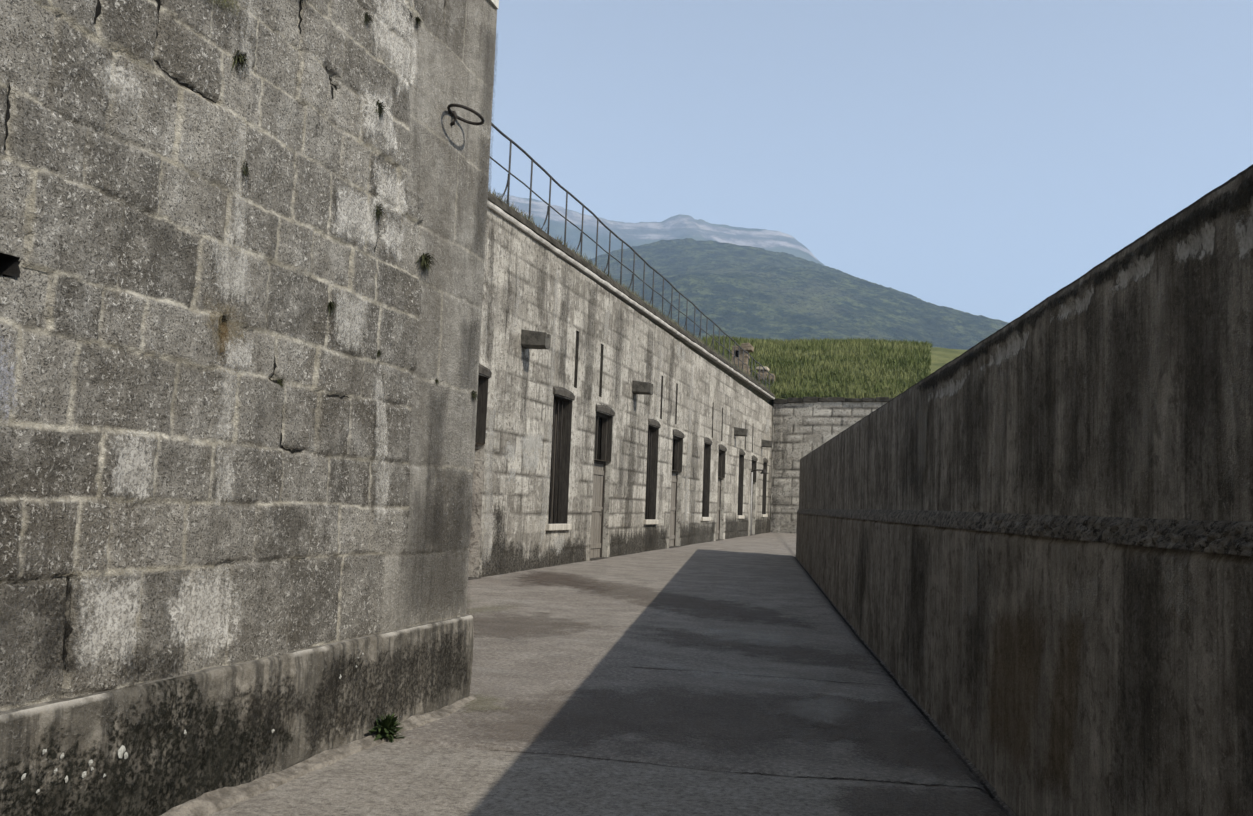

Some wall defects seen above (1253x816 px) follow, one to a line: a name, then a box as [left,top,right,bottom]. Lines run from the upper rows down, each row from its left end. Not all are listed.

crack [94,0,102,24]
crack [154,0,216,104]
crack [296,0,304,34]
crack [4,83,12,150]
damp [917,176,1253,391]
damp [479,411,895,677]
damp [36,573,239,684]
damp [234,612,598,750]